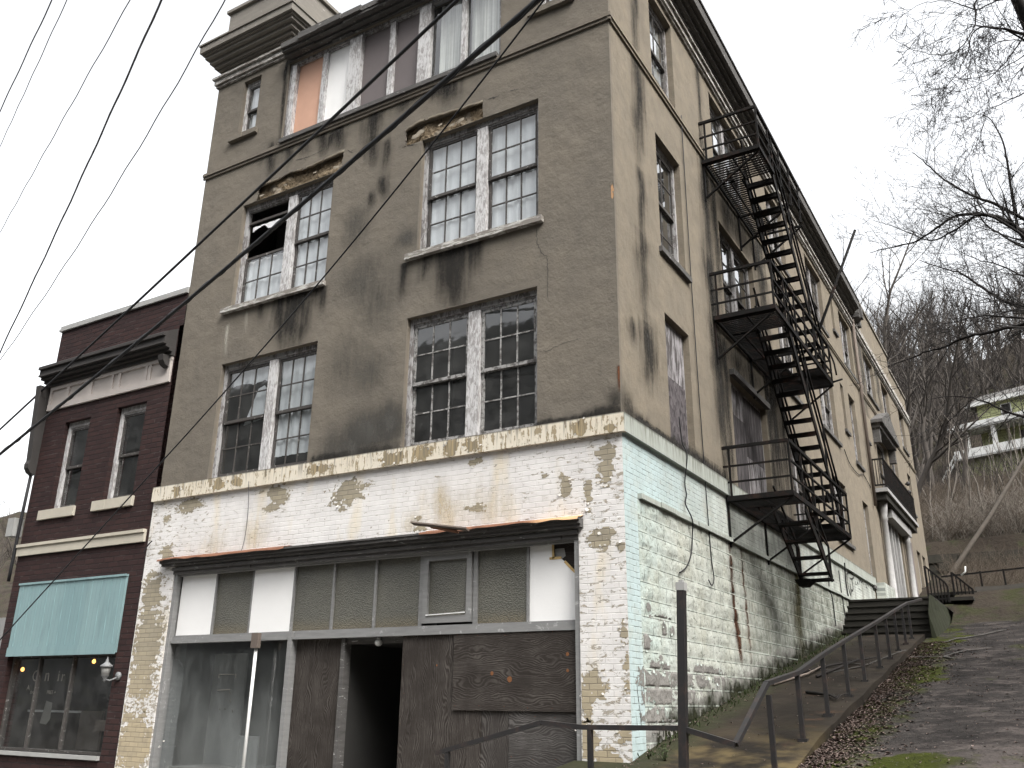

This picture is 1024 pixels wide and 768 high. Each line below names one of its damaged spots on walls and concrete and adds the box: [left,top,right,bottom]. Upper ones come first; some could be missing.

peeling [378,437,487,468]
peeling [541,424,618,515]